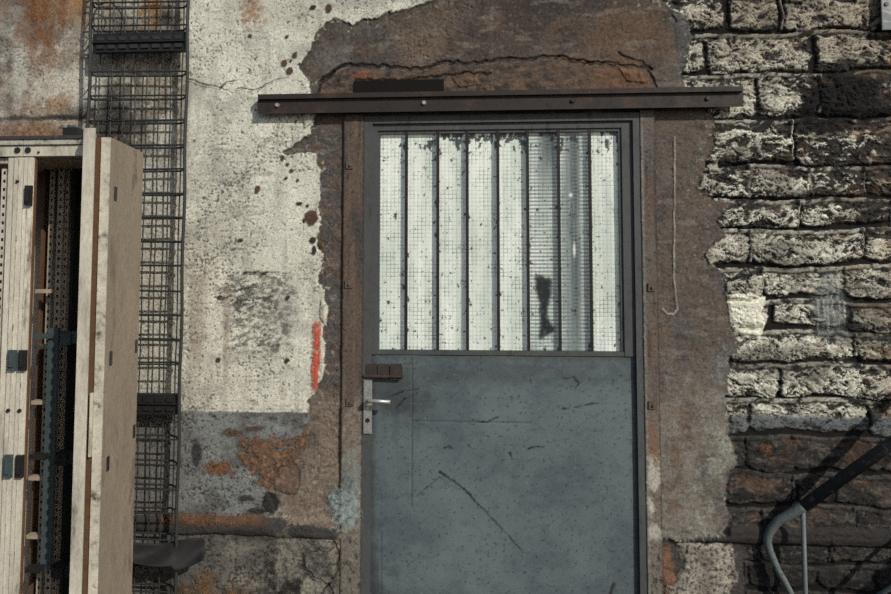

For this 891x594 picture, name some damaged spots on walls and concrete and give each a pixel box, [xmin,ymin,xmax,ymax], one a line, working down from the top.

spalling [281,0,693,93]
spalling [203,107,745,594]